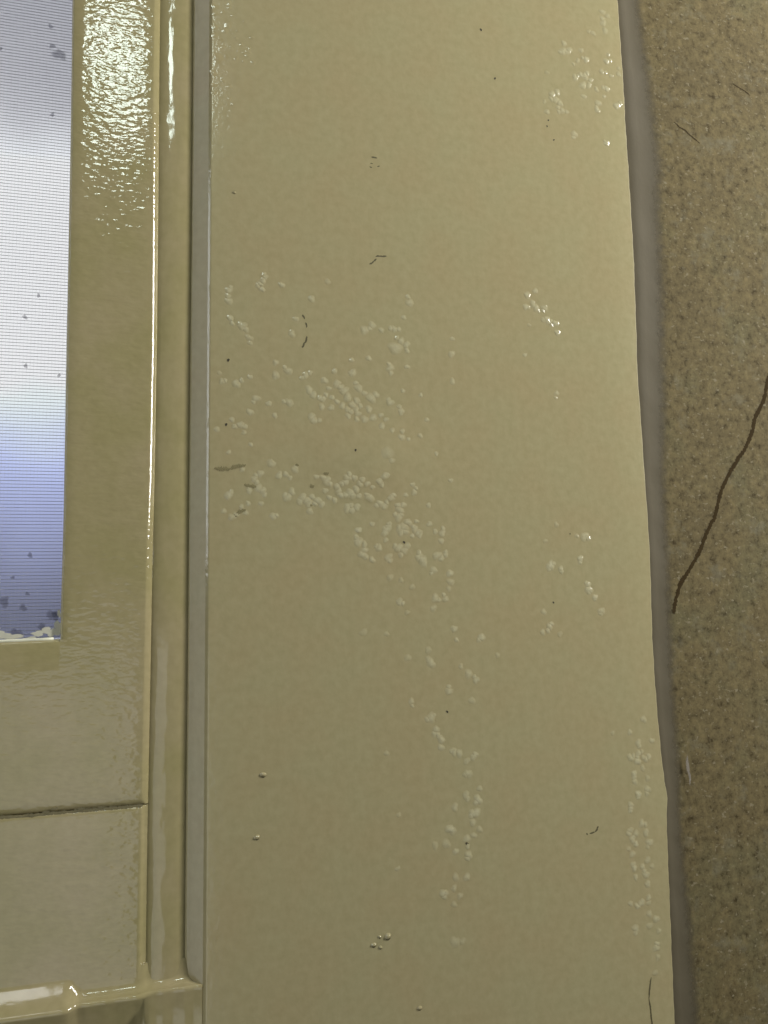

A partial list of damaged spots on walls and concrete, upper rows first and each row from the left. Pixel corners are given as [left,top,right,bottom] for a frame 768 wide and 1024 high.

crack [672,376,768,614]